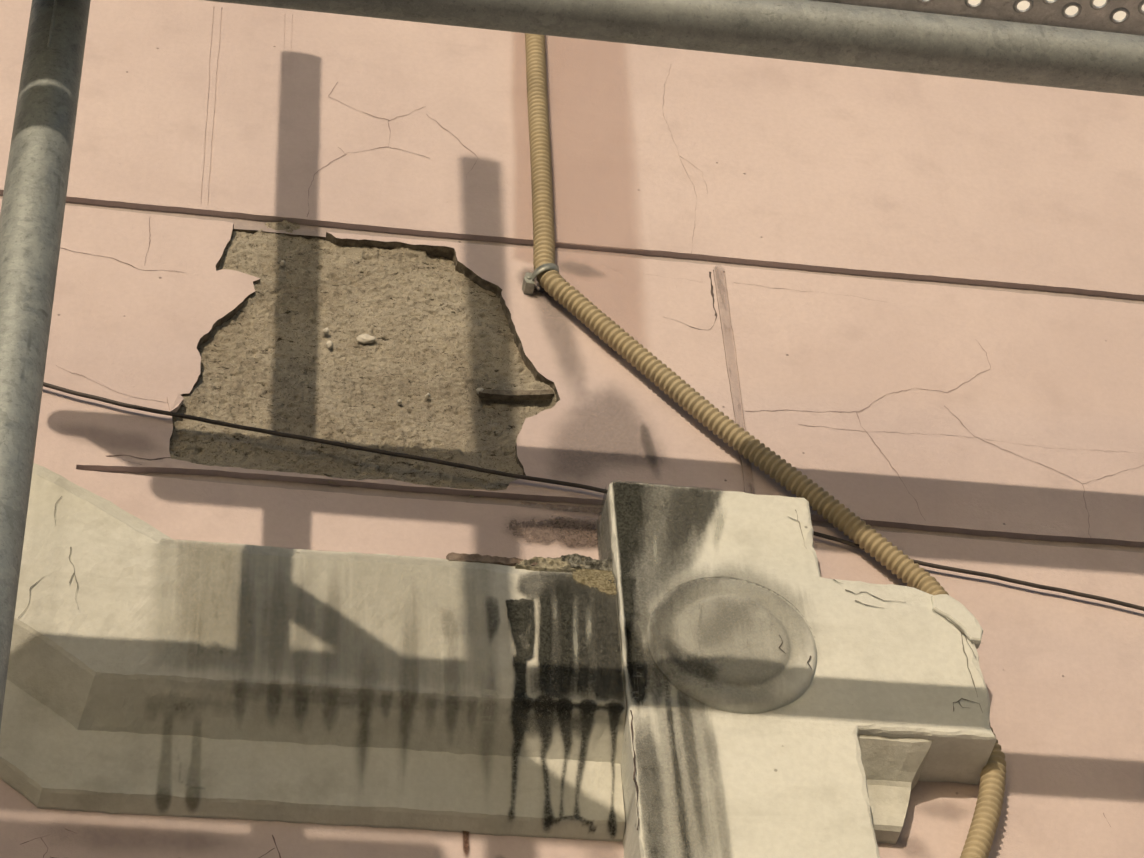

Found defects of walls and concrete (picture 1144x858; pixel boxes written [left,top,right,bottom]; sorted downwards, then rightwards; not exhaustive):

crack [307,82,477,217]
flaking render [167,220,560,499]
crack [749,341,1143,537]
spalling [446,552,613,573]
water stain [488,481,723,858]